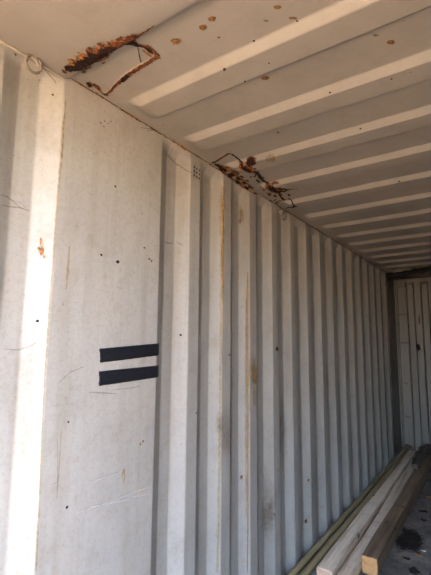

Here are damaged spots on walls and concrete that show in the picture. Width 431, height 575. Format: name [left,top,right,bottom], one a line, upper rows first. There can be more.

rust [62,25,154,74]
rust [72,79,385,272]
rust [246,273,257,570]